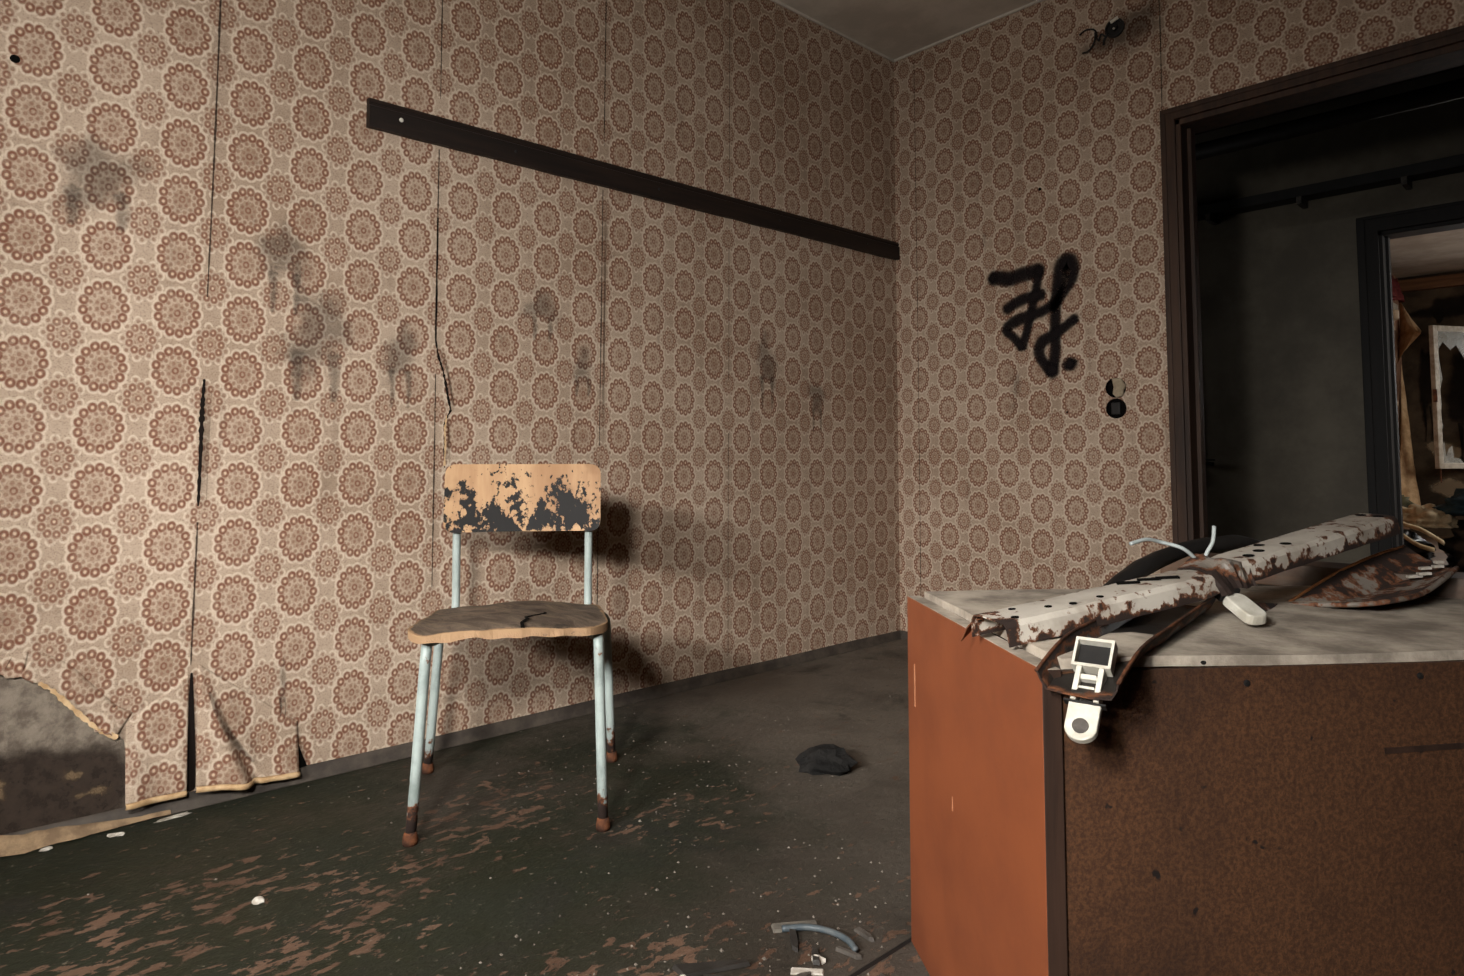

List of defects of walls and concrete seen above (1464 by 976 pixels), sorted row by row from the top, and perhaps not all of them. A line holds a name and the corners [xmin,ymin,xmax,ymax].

crack [435,217,455,468]
flaking render [0,675,125,762]